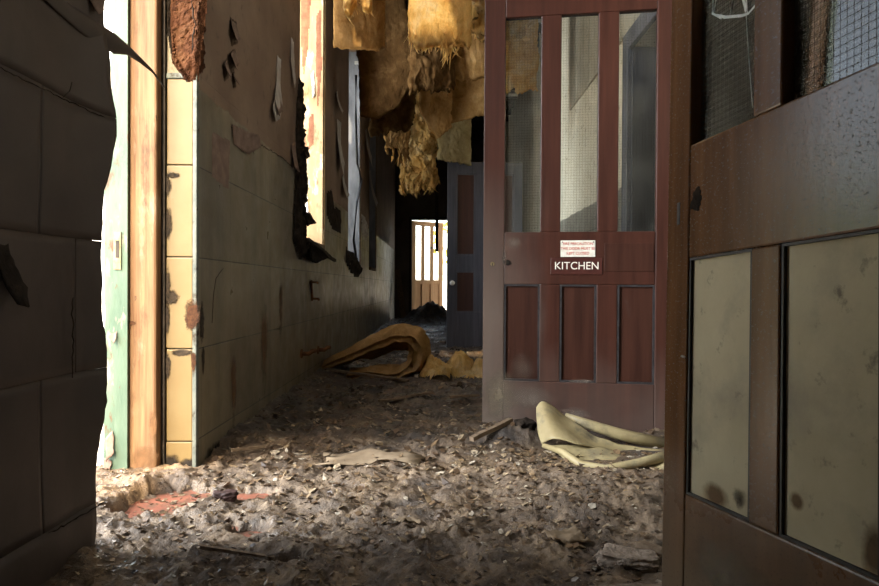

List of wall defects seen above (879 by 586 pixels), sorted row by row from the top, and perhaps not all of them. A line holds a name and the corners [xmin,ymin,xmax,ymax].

peeling [45,0,166,89]
spalling [167,0,207,82]
peeling [222,17,241,89]
spalling [273,0,363,277]
peeling [102,431,114,470]
damp [706,485,724,505]